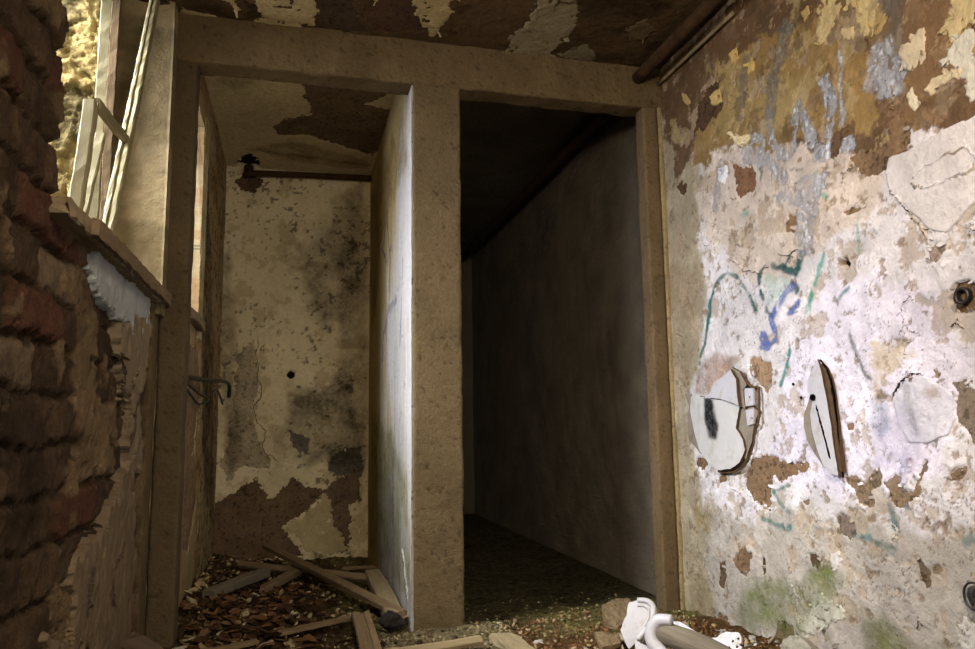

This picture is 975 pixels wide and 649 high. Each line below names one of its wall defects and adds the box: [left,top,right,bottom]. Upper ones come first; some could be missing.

flaking render [254,0,369,34]
peeling [412,0,460,37]
peeling [505,0,596,62]
peeling [801,0,888,45]
peeling [898,0,975,111]
flaking render [273,84,390,156]
flaking render [829,114,912,177]
flaking render [717,164,757,201]
flaking render [952,379,975,444]
flaking render [213,339,366,561]
flaking render [744,453,810,511]
flaking render [842,444,928,510]